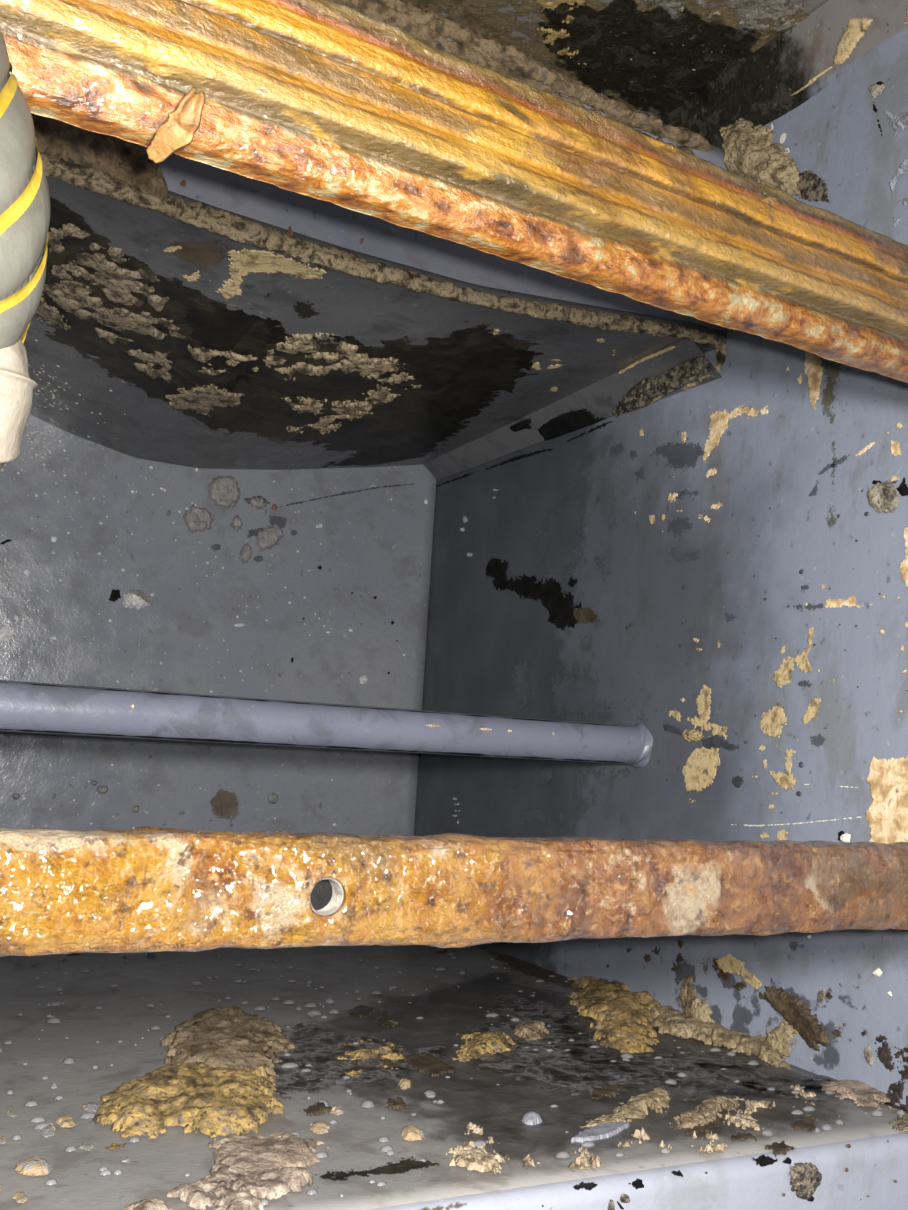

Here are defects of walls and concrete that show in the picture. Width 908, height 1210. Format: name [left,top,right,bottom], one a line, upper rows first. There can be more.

corrosion [146,86,205,163]
corrosion [402,0,810,119]
damp [539,0,809,149]
damp [28,197,543,467]
corrosion [510,357,717,441]
peeling [752,527,908,809]
peeling [668,685,728,803]
peeling [865,755,908,843]
corrosion [712,957,766,1000]
damp [271,953,851,1159]
peeling [861,1030,908,1110]
spalling [685,1114,822,1202]